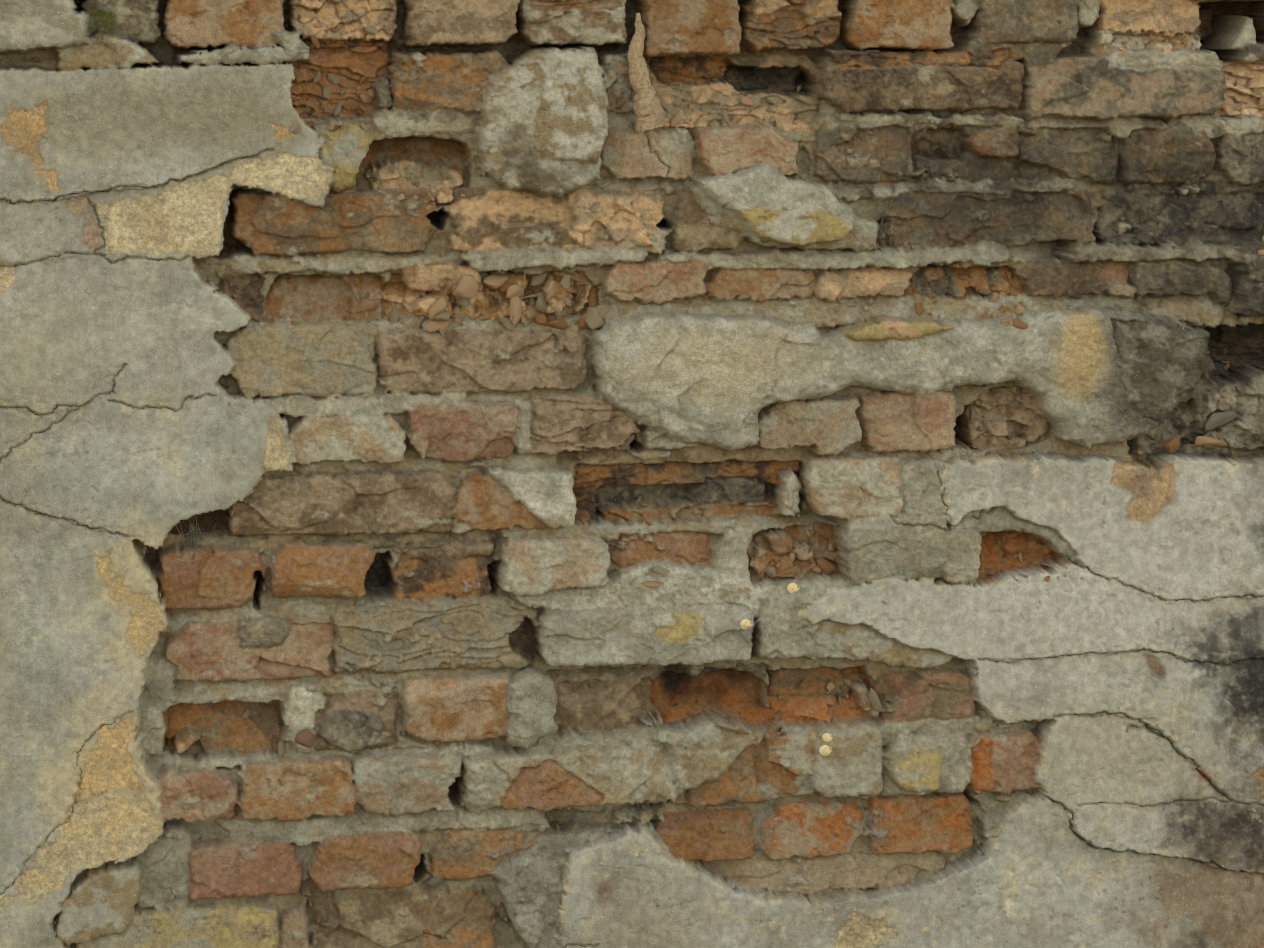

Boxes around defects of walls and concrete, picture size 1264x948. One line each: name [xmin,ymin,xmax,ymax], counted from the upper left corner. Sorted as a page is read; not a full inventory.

spalling [273,0,469,205]
spalling [646,52,822,131]
crack [1,149,270,267]
peeling [1,102,331,255]
spalling [264,263,605,335]
spalling [573,460,844,583]
spalling [978,531,1066,581]
peeling [0,716,163,946]
spalling [164,700,317,757]
crack [1046,711,1262,855]
water stain [1180,805,1264,867]
water stain [1195,630,1264,740]